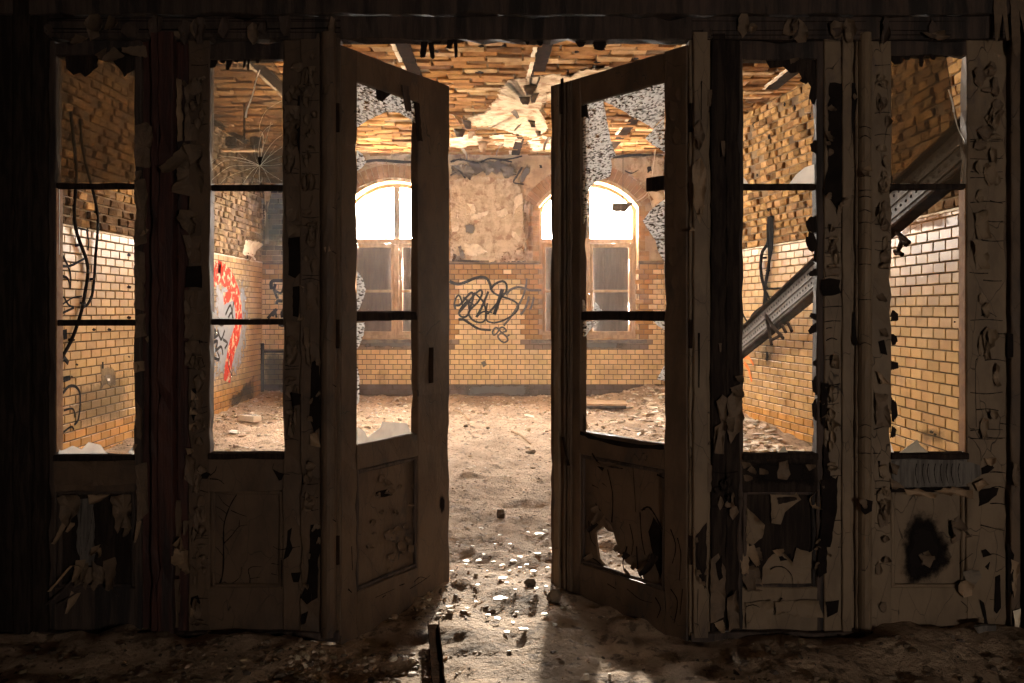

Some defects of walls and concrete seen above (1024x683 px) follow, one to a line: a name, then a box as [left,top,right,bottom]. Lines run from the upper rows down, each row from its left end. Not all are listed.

peeling [127,57,260,343]
peeling [449,41,612,263]
peeling [766,58,858,214]
peeling [861,53,949,269]
peeling [132,402,142,451]
peeling [812,359,829,427]
peeling [874,293,899,438]
peeling [51,461,149,614]
crack [216,494,279,583]
crack [585,470,683,622]
peeling [694,375,839,633]
peeling [1013,609,1021,627]